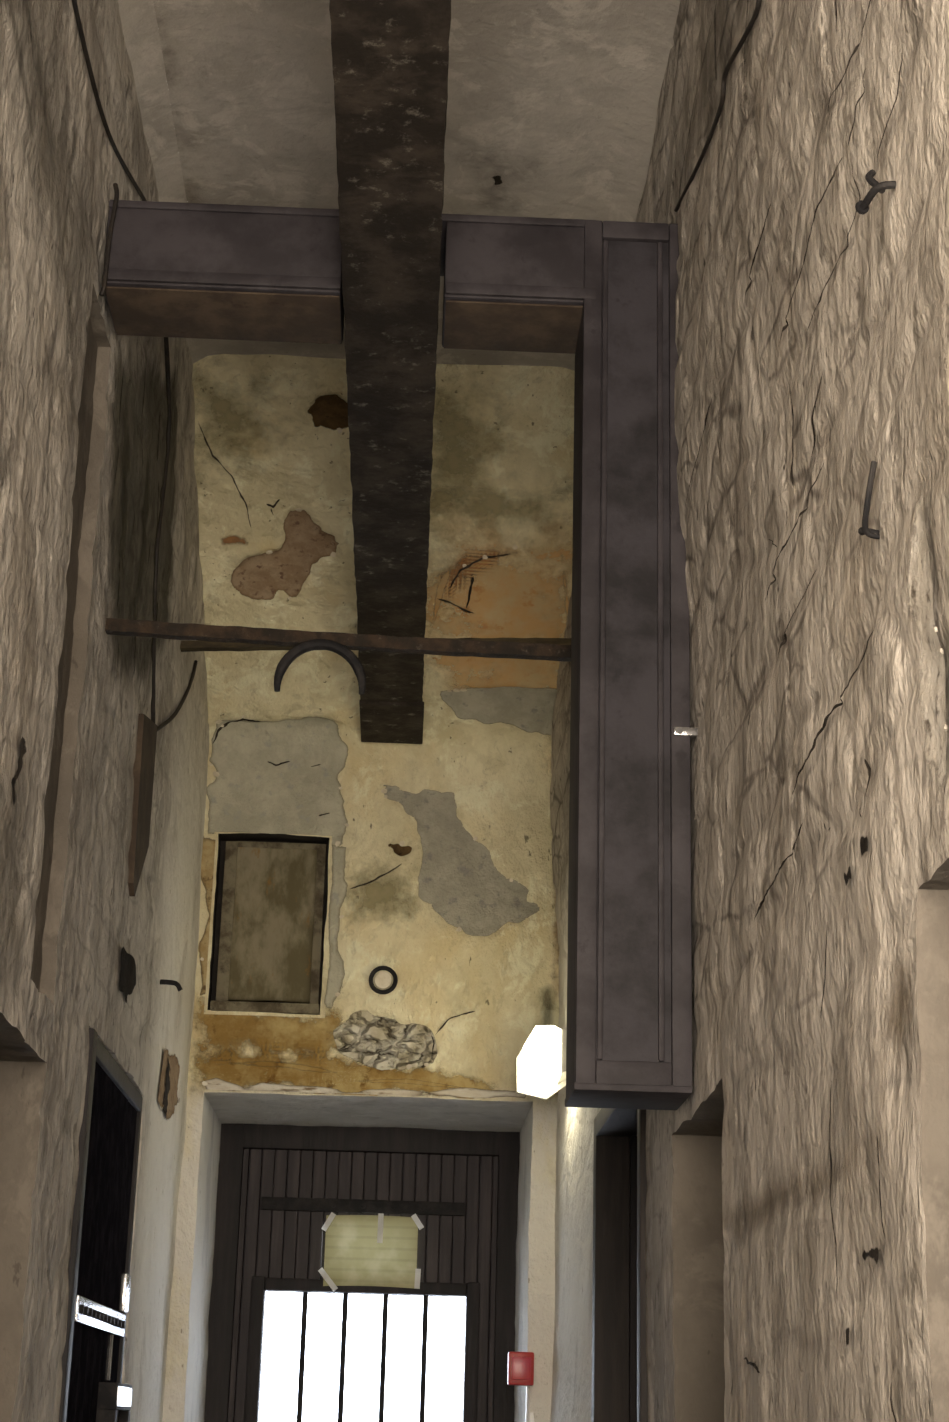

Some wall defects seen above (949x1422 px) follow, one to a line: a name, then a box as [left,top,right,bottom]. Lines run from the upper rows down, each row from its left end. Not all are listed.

flaking render [308,394,348,434]
flaking render [231,508,338,600]
peeling [198,717,349,1008]
peeling [381,785,539,936]
flaking render [158,1049,180,1120]
leakage [193,1001,491,1099]
peeling [202,1078,526,1098]
flaking render [333,1011,437,1070]